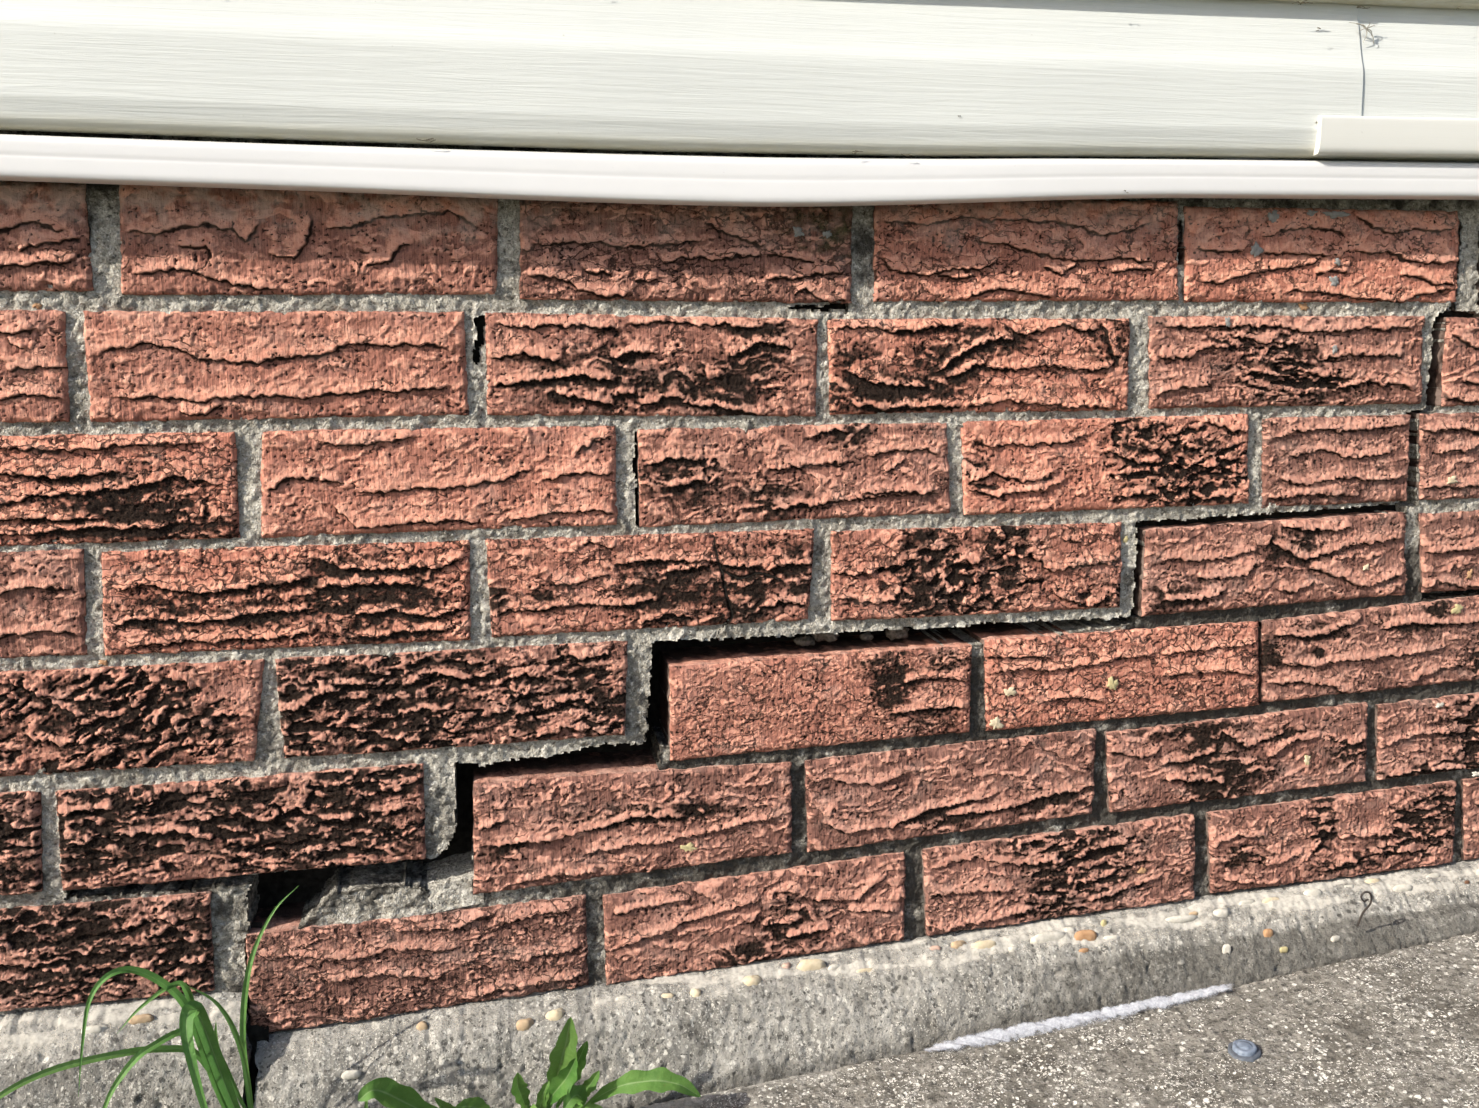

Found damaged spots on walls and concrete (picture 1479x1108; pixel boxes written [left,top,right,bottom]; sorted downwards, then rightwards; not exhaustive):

crack [472,315,485,365]
crack [788,303,846,312]
crack [1433,307,1474,323]
crack [631,431,639,526]
crack [1135,503,1396,534]
crack [1422,589,1479,598]
crack [553,530,996,756]
crack [250,761,478,928]
crack [246,1000,269,1106]